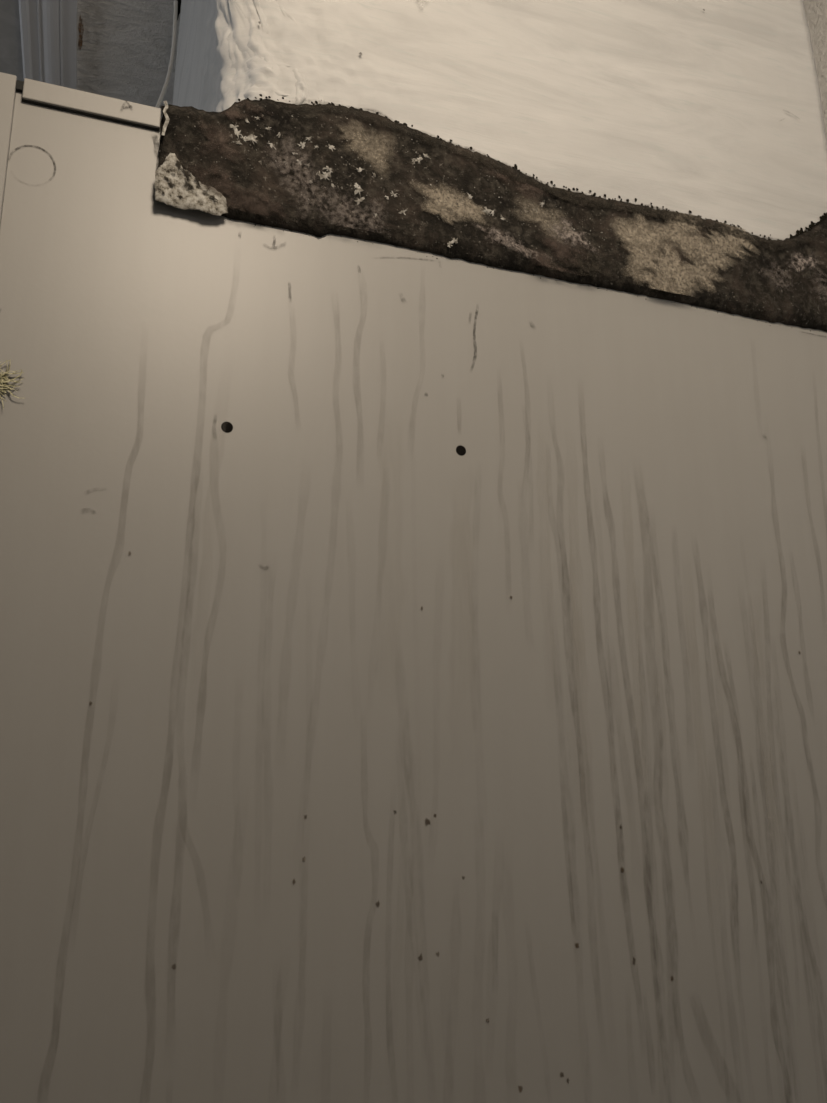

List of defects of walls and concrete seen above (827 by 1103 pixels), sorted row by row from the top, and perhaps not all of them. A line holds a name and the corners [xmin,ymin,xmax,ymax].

water stain [158,94,827,332]